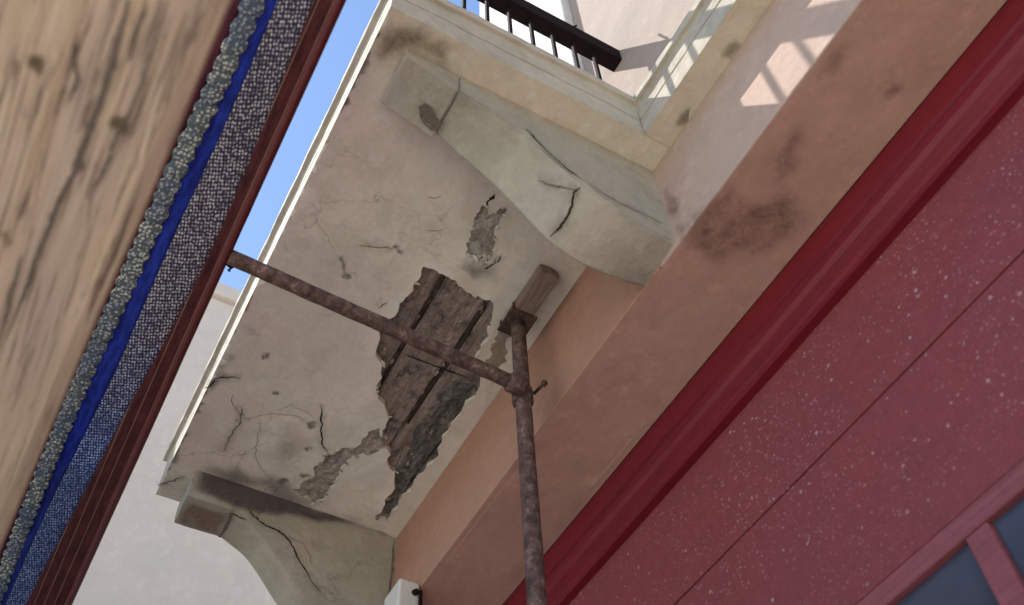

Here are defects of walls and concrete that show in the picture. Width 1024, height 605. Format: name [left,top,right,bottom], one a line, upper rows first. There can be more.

spalling [419,103,440,131]
spalling [464,194,507,269]
crack [529,131,650,237]
spalling [390,267,511,368]
crack [204,377,328,484]
spalling [279,333,481,520]
damp [200,472,349,521]
crack [218,510,320,592]